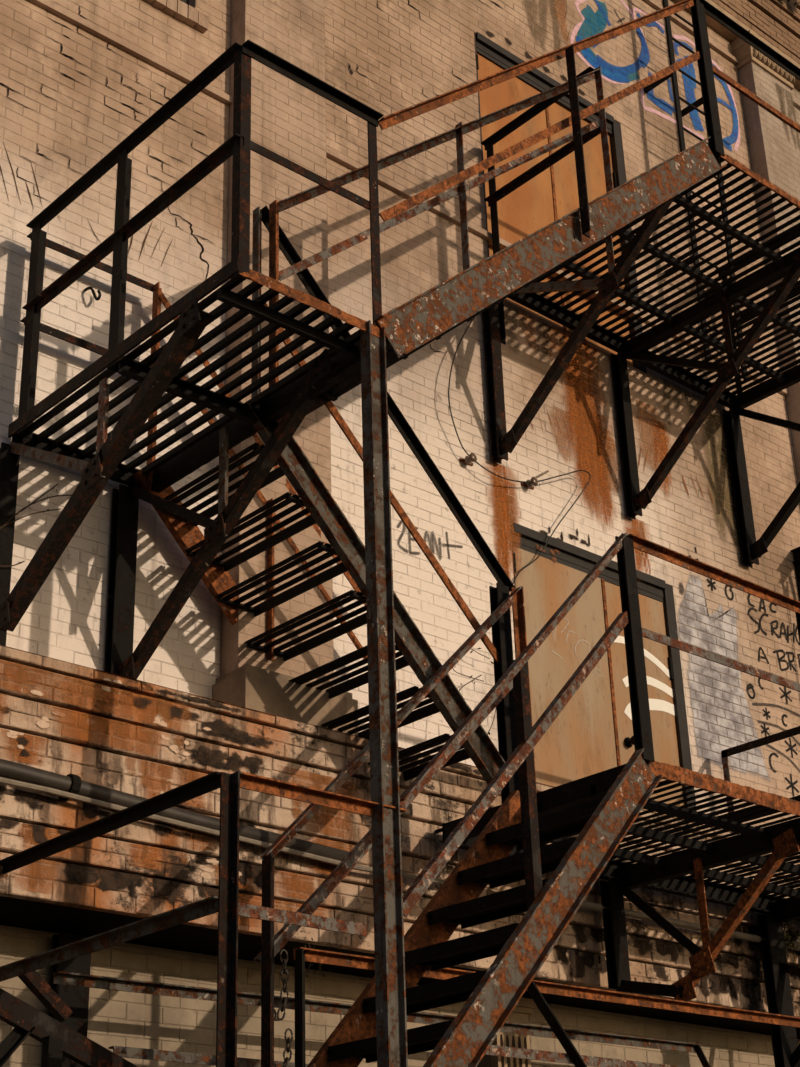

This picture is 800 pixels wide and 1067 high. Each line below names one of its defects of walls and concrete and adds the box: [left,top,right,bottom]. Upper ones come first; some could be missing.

crack [0,6,212,280]
rust [567,338,612,522]
rust [493,462,513,577]
spalling [7,730,29,757]
peeling [36,711,66,729]
peeling [153,712,190,757]
water stain [556,925,607,978]
water stain [630,936,703,980]
water stain [696,924,767,1004]